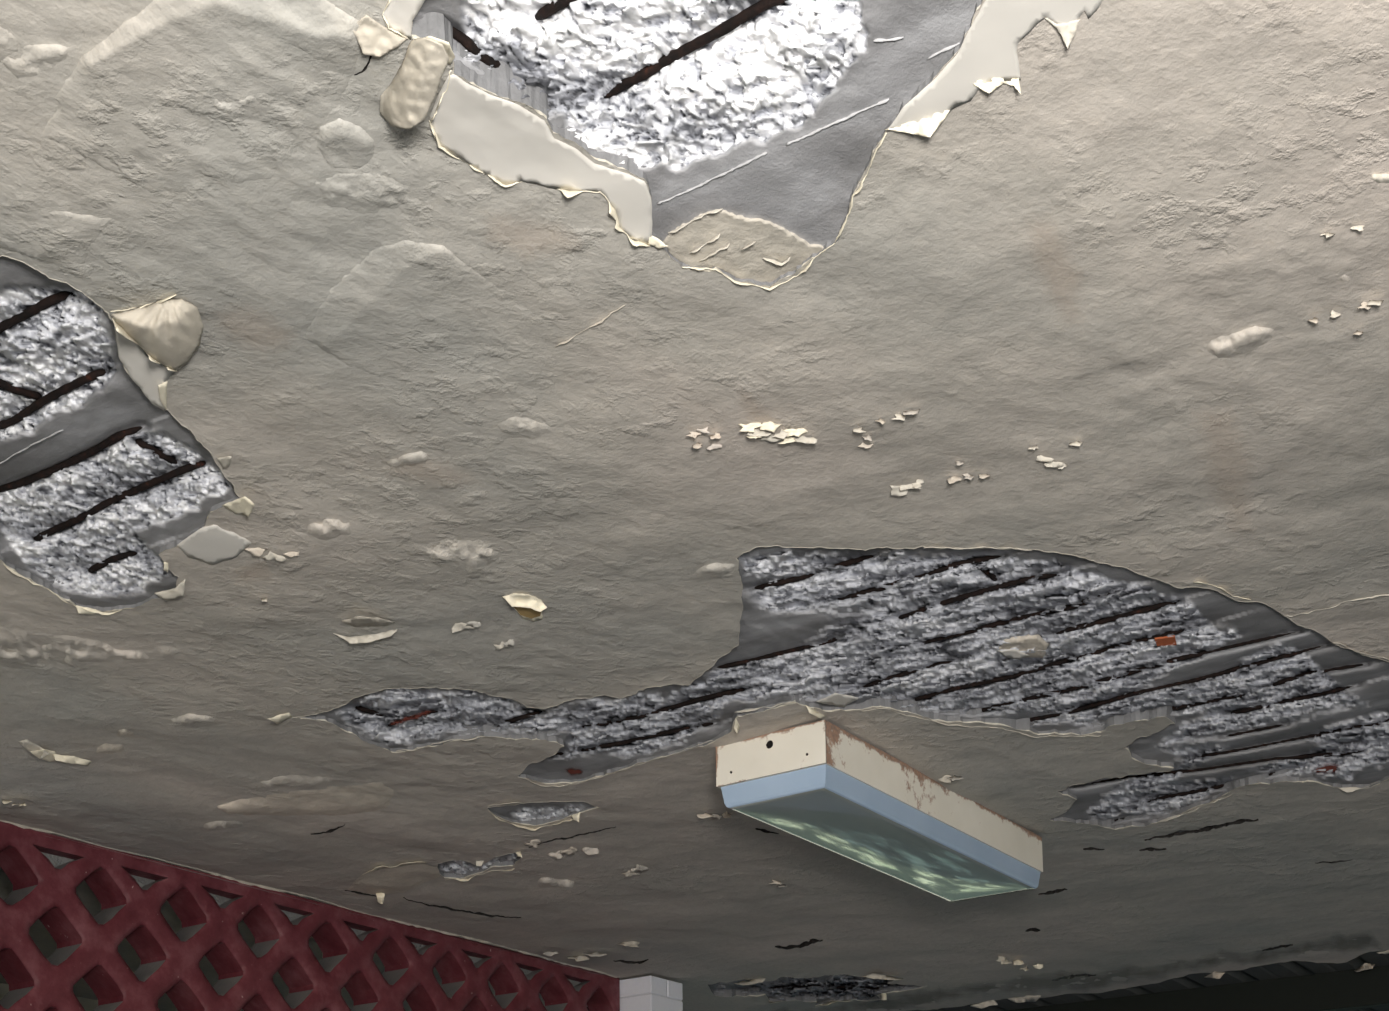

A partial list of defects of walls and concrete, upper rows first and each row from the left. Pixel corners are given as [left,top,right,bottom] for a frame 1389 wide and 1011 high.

spalling [353,0,1103,291]
spalling [0,255,300,615]
spalling [267,540,1389,904]
crack [1140,819,1258,851]
crack [345,890,521,918]
flaking render [1354,950,1389,972]
spalling [708,973,926,1008]
flaking render [971,995,1041,1009]